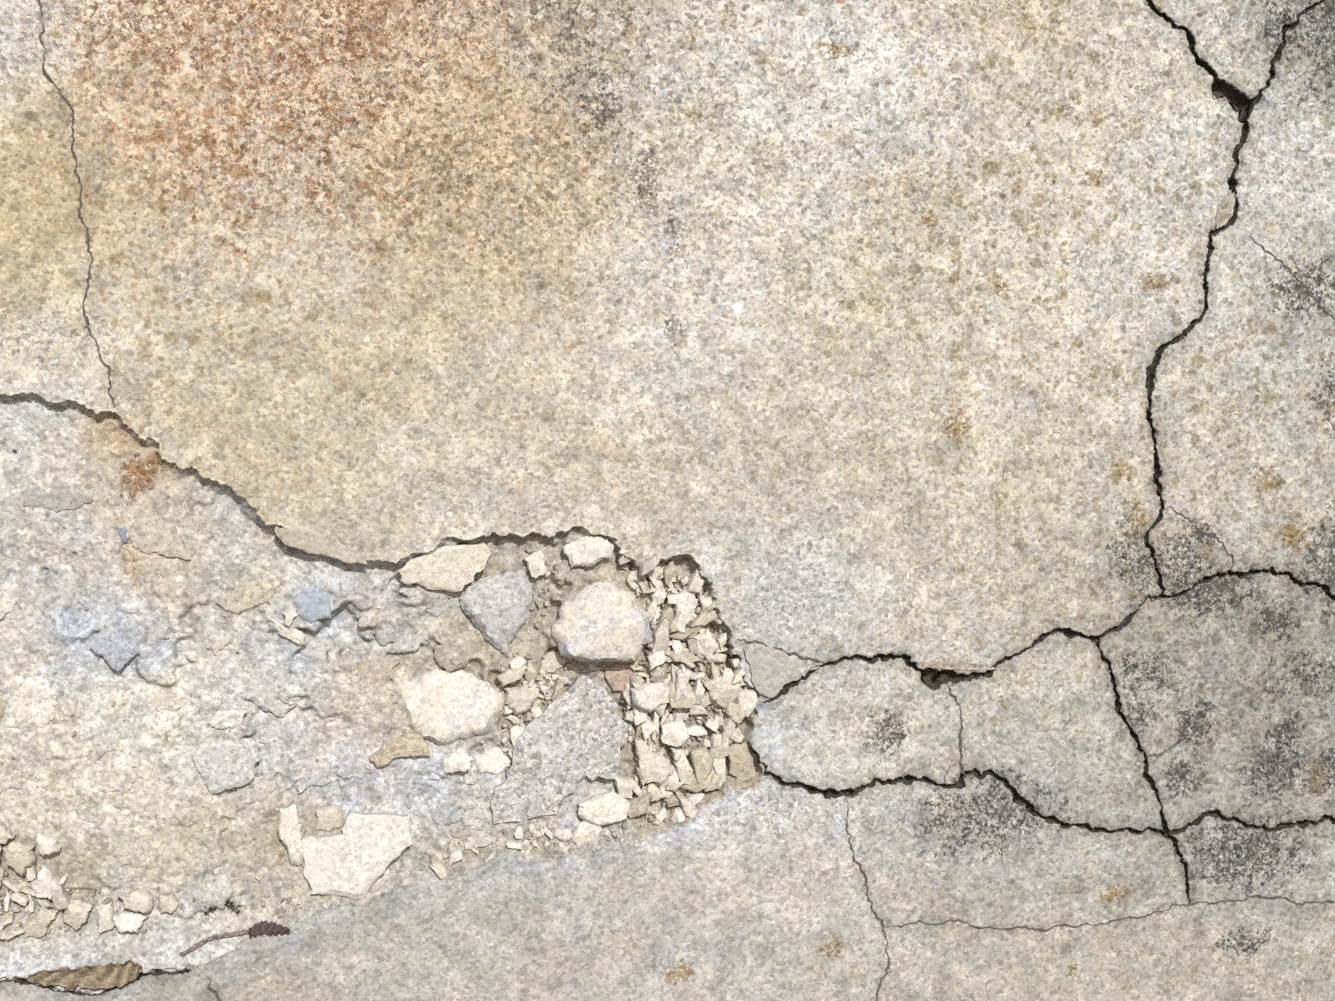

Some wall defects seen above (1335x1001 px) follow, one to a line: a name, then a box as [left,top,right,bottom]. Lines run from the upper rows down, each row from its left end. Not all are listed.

crack [37,0,115,408]
corrosion [49,0,443,224]
spalling [0,392,820,996]
crack [738,0,1335,1001]